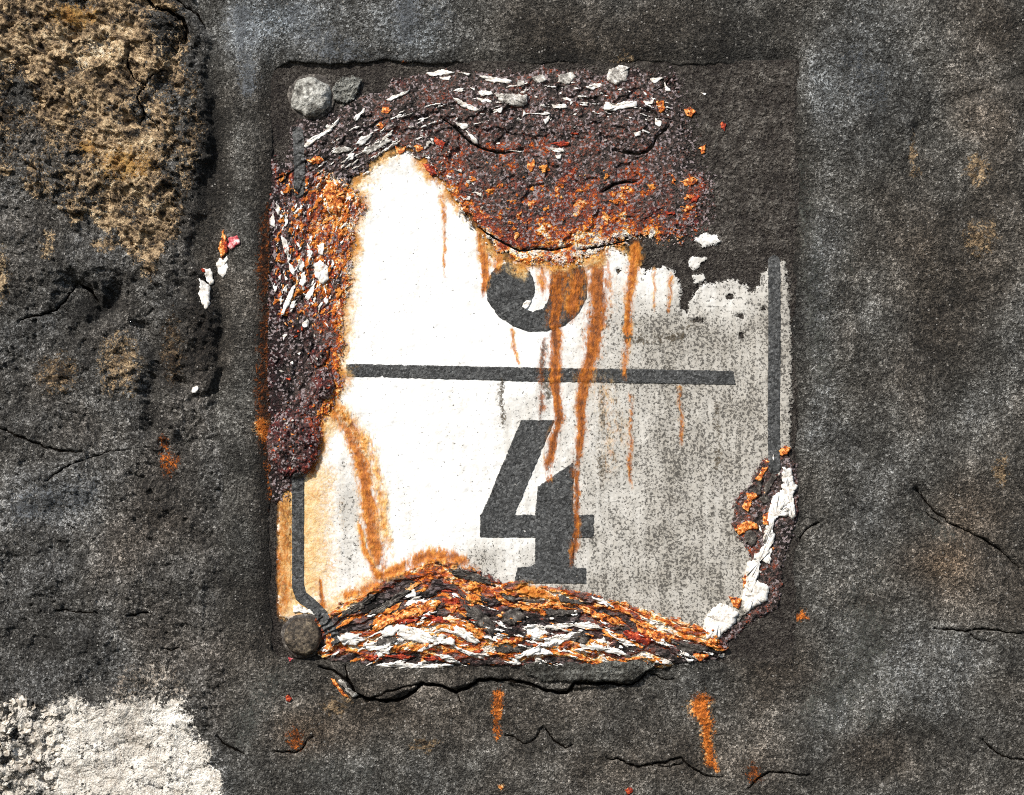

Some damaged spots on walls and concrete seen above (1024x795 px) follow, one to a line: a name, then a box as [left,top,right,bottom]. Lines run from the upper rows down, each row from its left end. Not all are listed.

corrosion [254,64,729,669]
crack [0,428,130,482]
peeling [702,446,800,648]
crack [916,490,1018,567]
crack [934,628,1022,642]
crack [320,666,675,703]
corrosion [491,690,504,740]
corrosion [689,692,720,773]